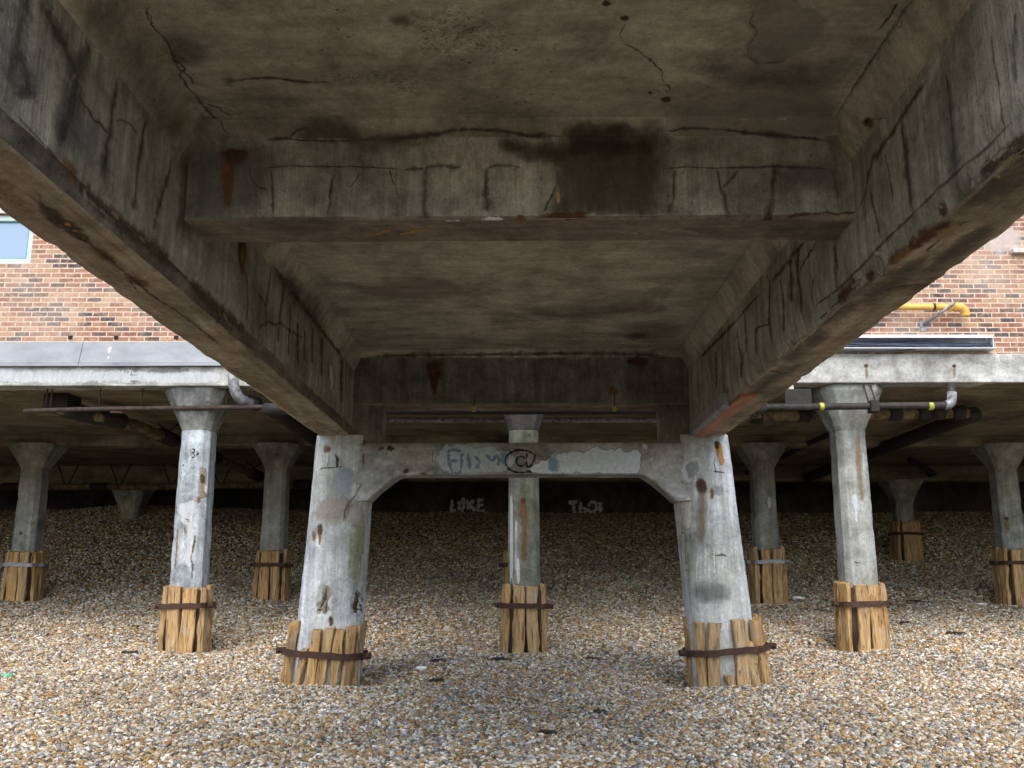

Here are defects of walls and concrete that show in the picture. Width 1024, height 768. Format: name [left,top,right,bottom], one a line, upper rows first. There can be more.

crack [146,8,230,124]
crack [620,24,671,90]
crack [6,0,183,275]
crack [250,128,545,218]
water stain [502,126,659,215]
crack [669,4,1016,388]
crack [246,268,343,393]
corrosion [696,478,714,537]
spalling [317,585,331,614]